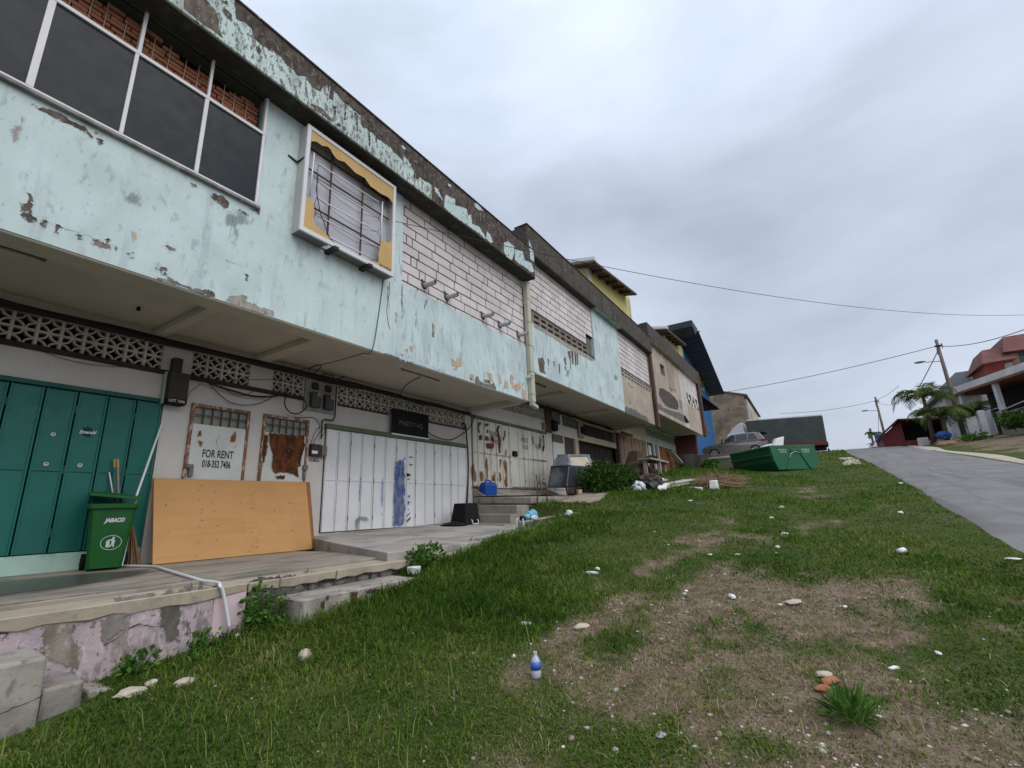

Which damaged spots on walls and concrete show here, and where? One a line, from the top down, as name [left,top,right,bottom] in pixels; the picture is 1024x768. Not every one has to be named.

peeling [183,0,232,38]
peeling [31,101,104,146]
peeling [312,102,377,146]
peeling [19,192,63,234]
peeling [211,193,260,216]
peeling [434,184,534,272]
spalling [155,266,274,316]
spalling [534,325,594,366]
spalling [451,358,526,400]
corrosion [262,433,305,479]
peeling [100,592,156,646]
spalling [40,623,83,669]